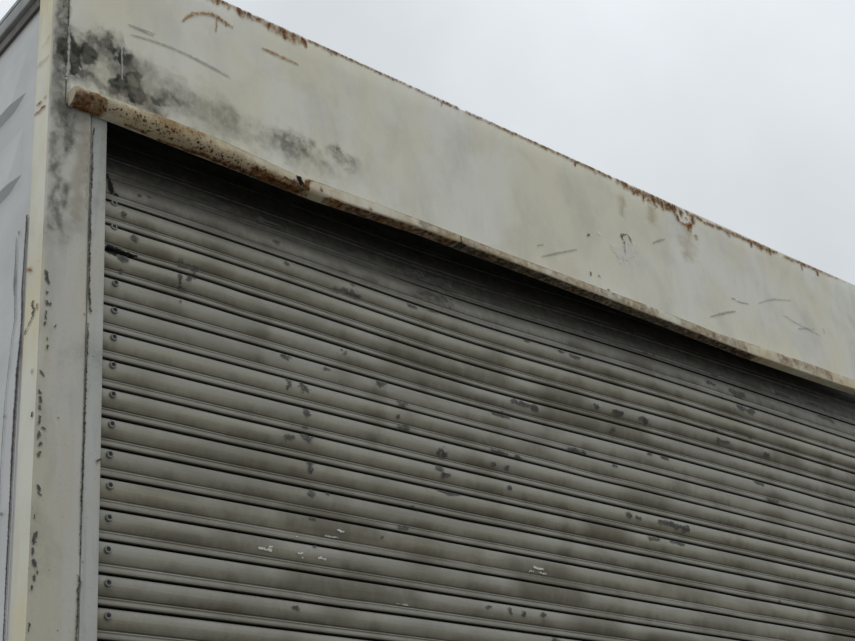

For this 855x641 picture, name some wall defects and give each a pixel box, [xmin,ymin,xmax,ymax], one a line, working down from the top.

rust [71,88,755,360]
rust [184,0,838,279]
peeling [37,389,46,457]
peeling [436,446,451,479]